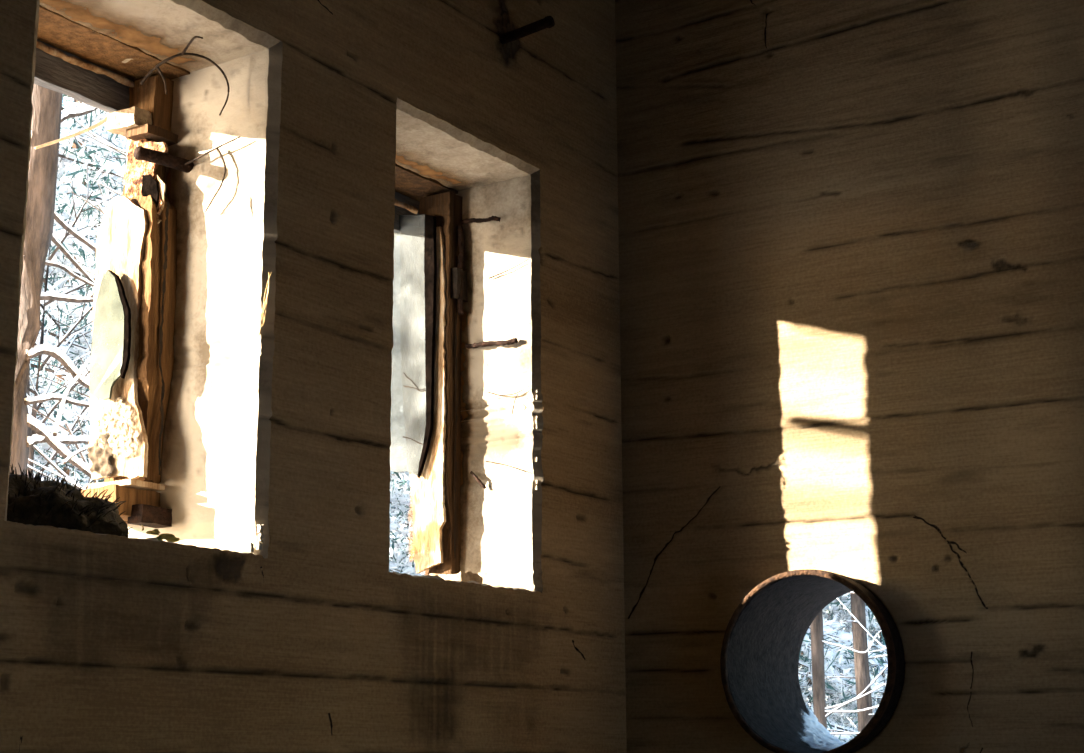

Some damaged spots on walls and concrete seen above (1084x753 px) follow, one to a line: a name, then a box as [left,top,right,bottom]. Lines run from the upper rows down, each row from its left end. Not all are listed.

crack [628,486,720,619]
crack [913,515,988,609]